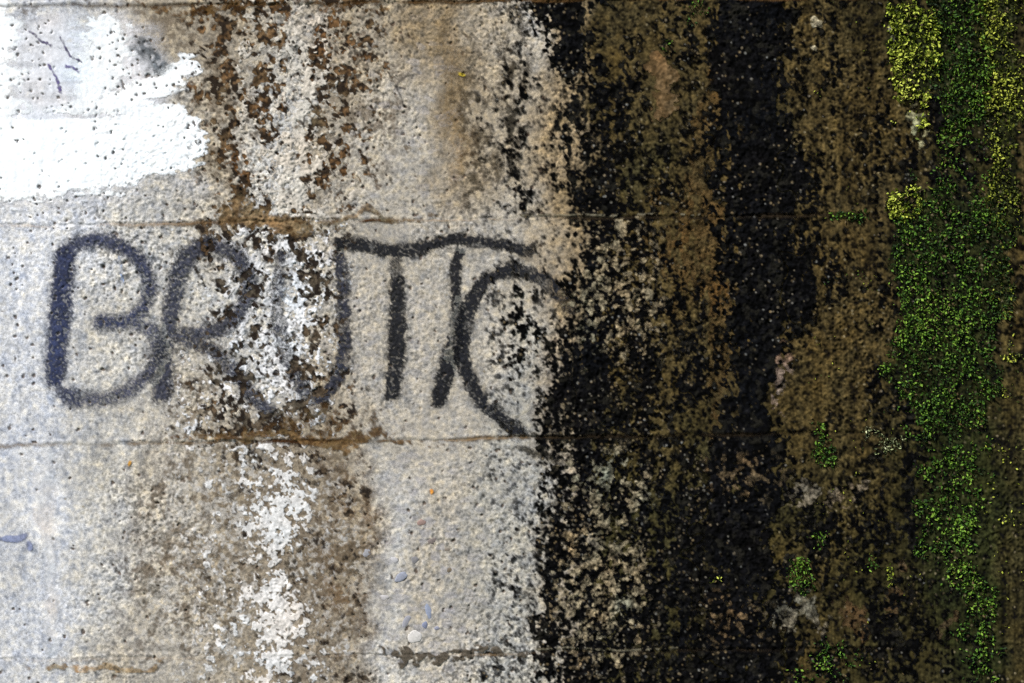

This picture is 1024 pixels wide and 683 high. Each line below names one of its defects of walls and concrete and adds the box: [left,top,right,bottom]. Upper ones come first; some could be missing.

rust [141,0,259,17]
rust [205,194,437,237]
rust [167,403,411,456]
leakage [515,429,572,461]